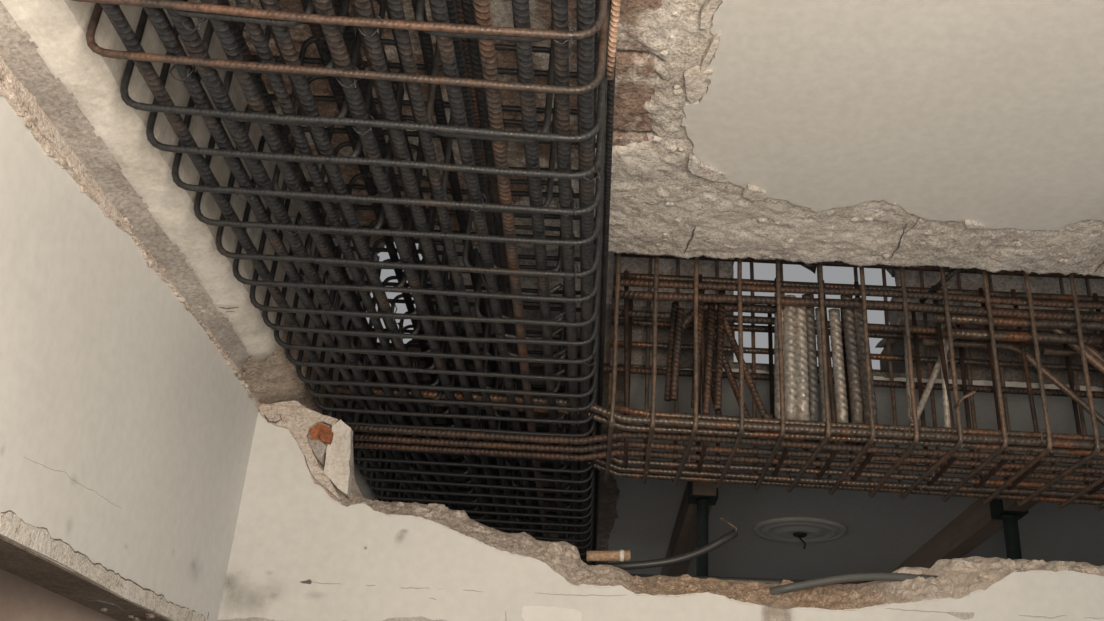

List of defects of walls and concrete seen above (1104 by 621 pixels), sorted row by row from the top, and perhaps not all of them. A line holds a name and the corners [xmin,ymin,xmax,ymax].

spalling [0,1,351,501]
flaking render [279,0,393,241]
flaking render [372,0,479,246]
flaking render [489,0,514,27]
flaking render [494,0,560,251]
flaking render [568,0,580,251]
spalling [608,0,1104,277]
spalling [0,510,283,621]
spalling [377,355,513,428]
spalling [423,454,532,535]
spalling [529,368,580,432]
spalling [597,366,639,562]